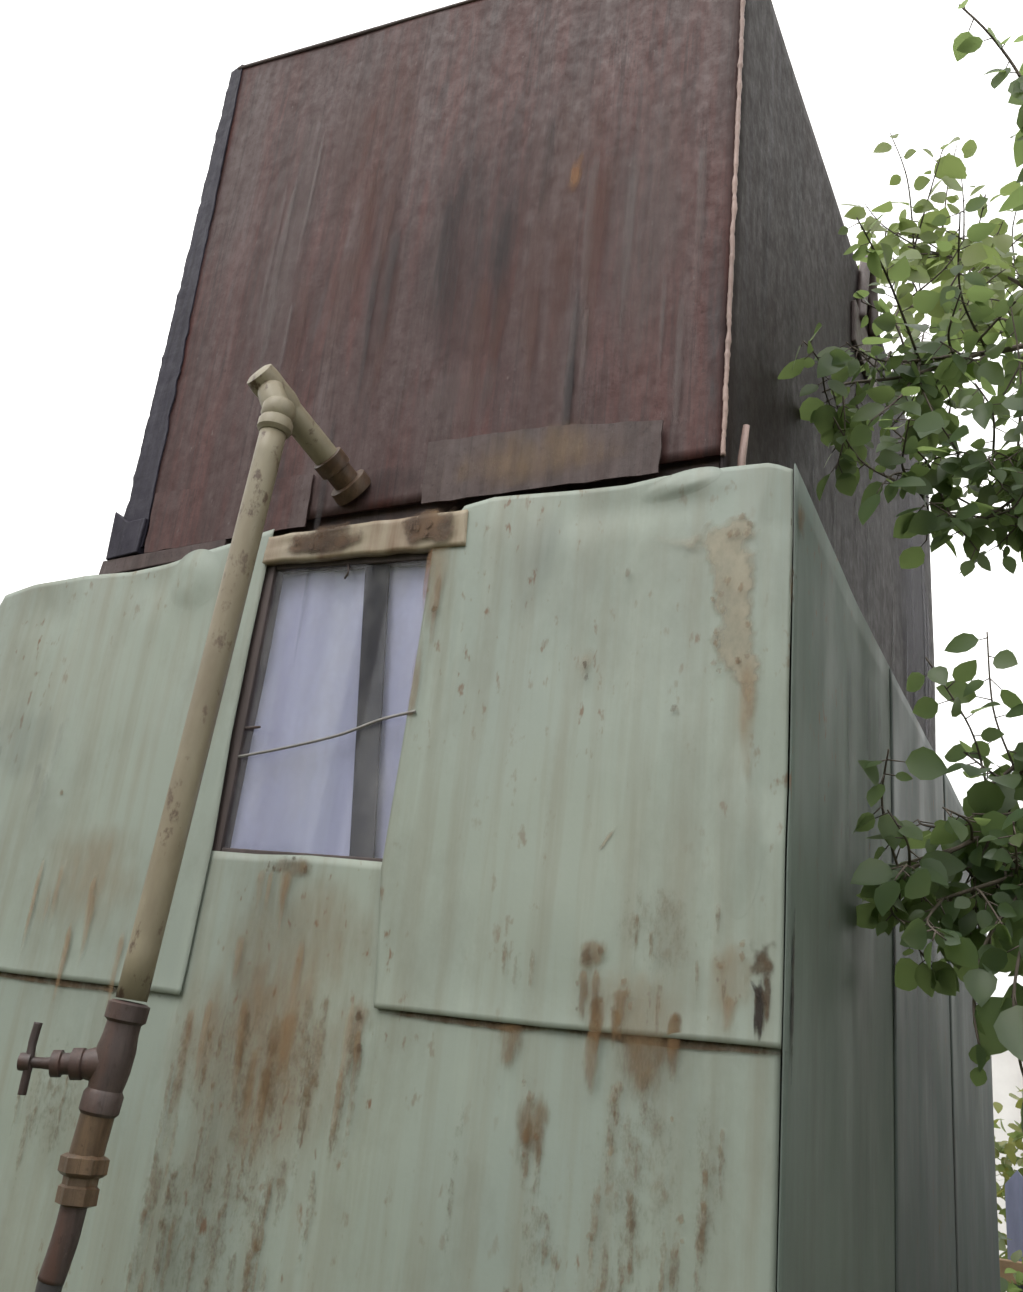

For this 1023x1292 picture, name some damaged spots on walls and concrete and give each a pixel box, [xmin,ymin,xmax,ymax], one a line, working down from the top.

rust [289,522,360,552]
rust [403,510,453,542]
rust [577,944,767,1077]
rust [752,951,773,1020]